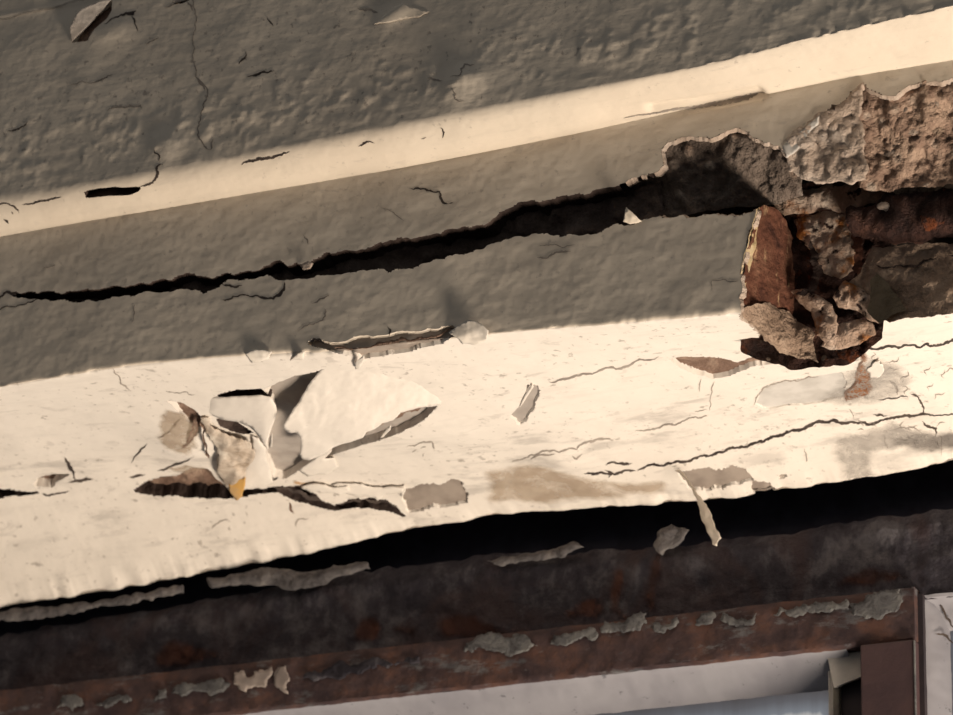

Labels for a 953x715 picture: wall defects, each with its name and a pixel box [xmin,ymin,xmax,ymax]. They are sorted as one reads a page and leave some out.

crack [166,0,213,150]
crack [452,63,474,102]
crack [242,152,288,165]
crack [0,181,666,330]
rust [739,205,819,363]
spalling [619,78,953,337]
peeling [130,320,488,514]
flaking render [676,356,759,374]
crack [513,339,953,478]
peeling [754,372,846,407]
rust [844,354,884,401]
rust [441,615,504,637]